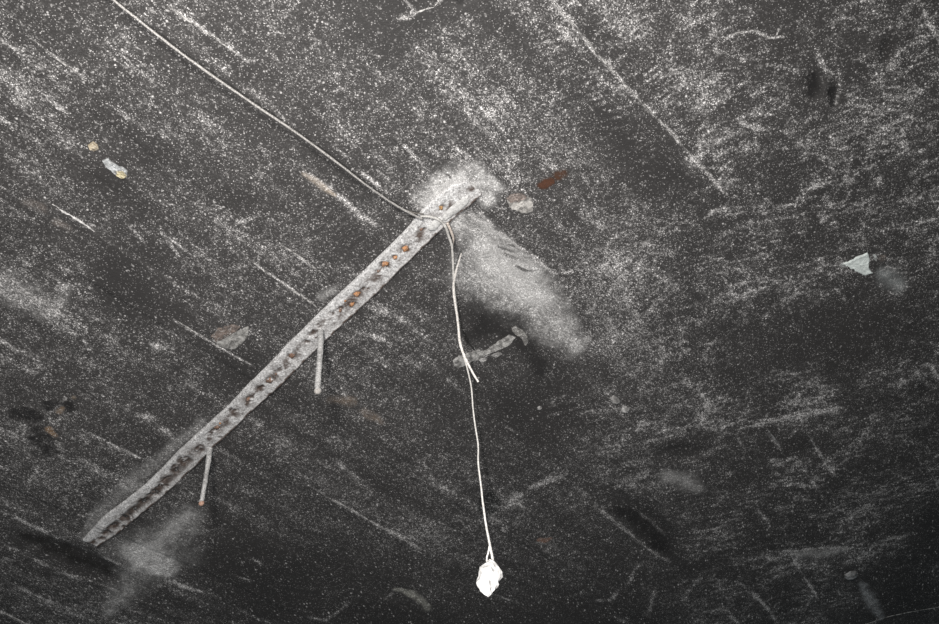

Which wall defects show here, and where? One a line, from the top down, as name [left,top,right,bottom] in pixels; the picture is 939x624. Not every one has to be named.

rust [538,171,566,189]
water stain [413,163,585,375]
spalling [211,324,249,349]
peeling [453,325,528,369]
water stain [108,515,201,603]